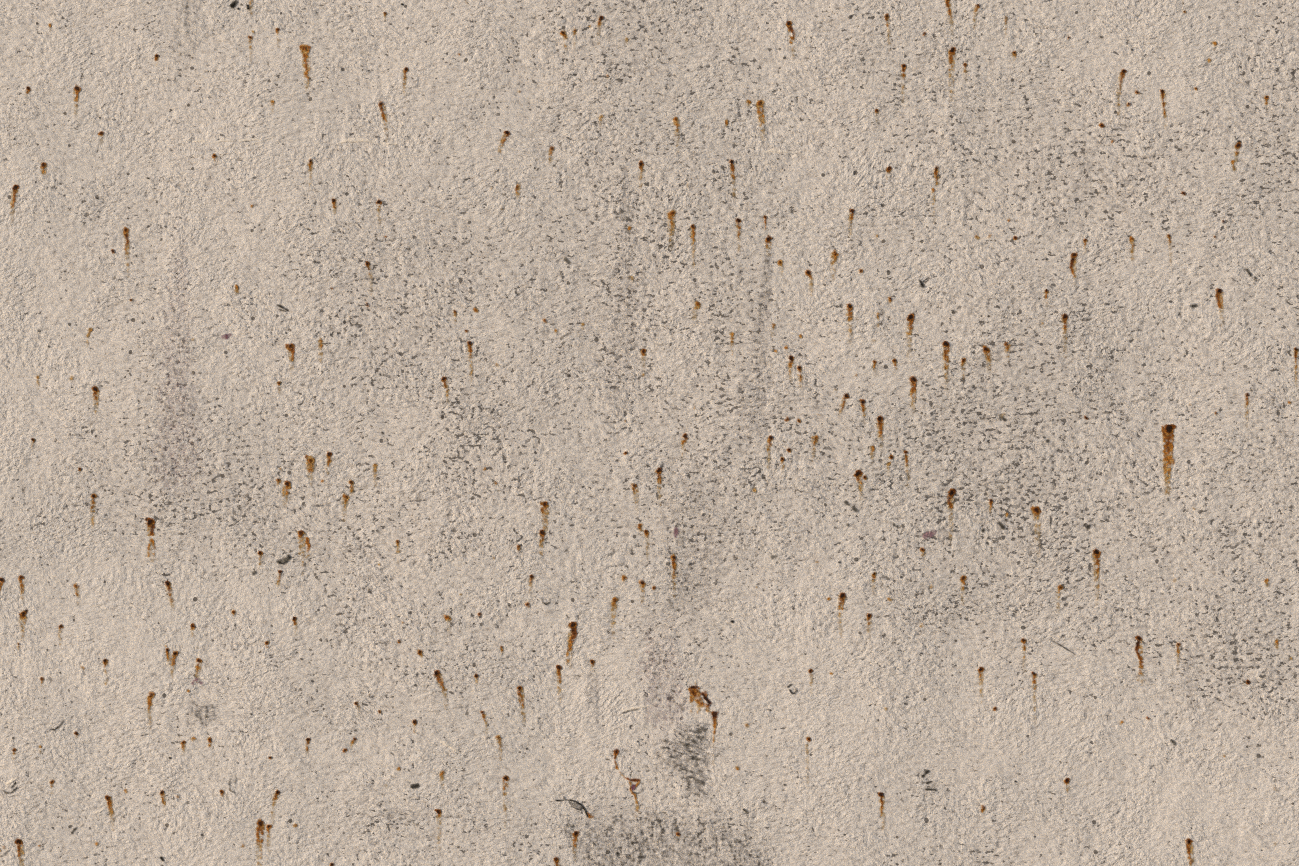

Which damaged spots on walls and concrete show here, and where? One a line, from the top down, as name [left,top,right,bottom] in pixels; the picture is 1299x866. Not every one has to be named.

rust [299,44,311,84]
rust [747,100,765,137]
rust [835,389,909,480]
rust [1162,424,1176,494]
rust [145,517,155,557]
rust [297,530,310,563]
rust [539,502,549,554]
rust [1092,548,1101,589]
rust [556,622,577,694]
rust [688,683,718,742]
rust [613,749,643,811]
rust [242,790,279,866]